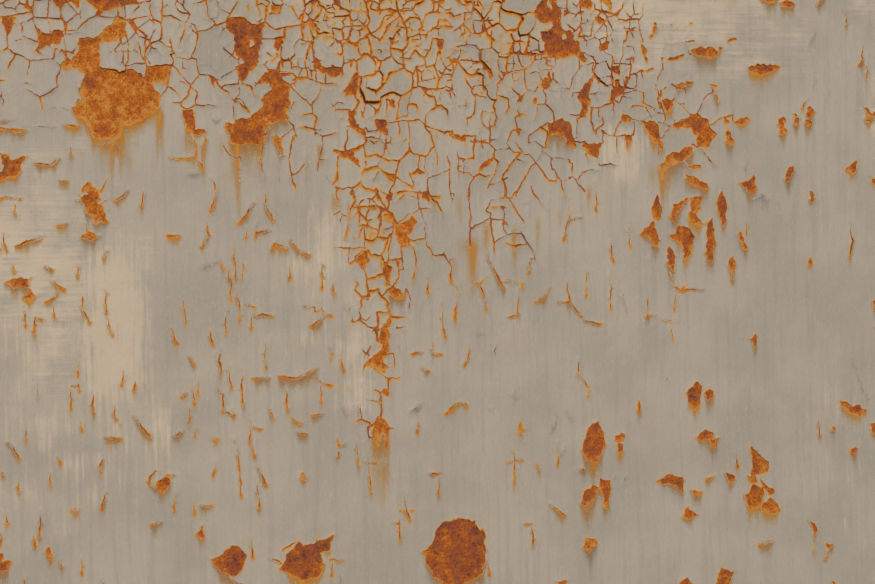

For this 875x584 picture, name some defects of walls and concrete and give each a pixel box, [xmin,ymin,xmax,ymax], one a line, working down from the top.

crack [0,193,73,276]
crack [22,250,116,340]
rust [53,0,171,245]
crack [68,133,381,563]
rust [221,12,293,185]
peeling [0,0,675,458]
crack [409,220,635,376]
rust [516,0,617,107]
rust [637,78,754,277]
crack [0,425,66,550]
rust [268,524,346,584]
rust [420,515,489,584]